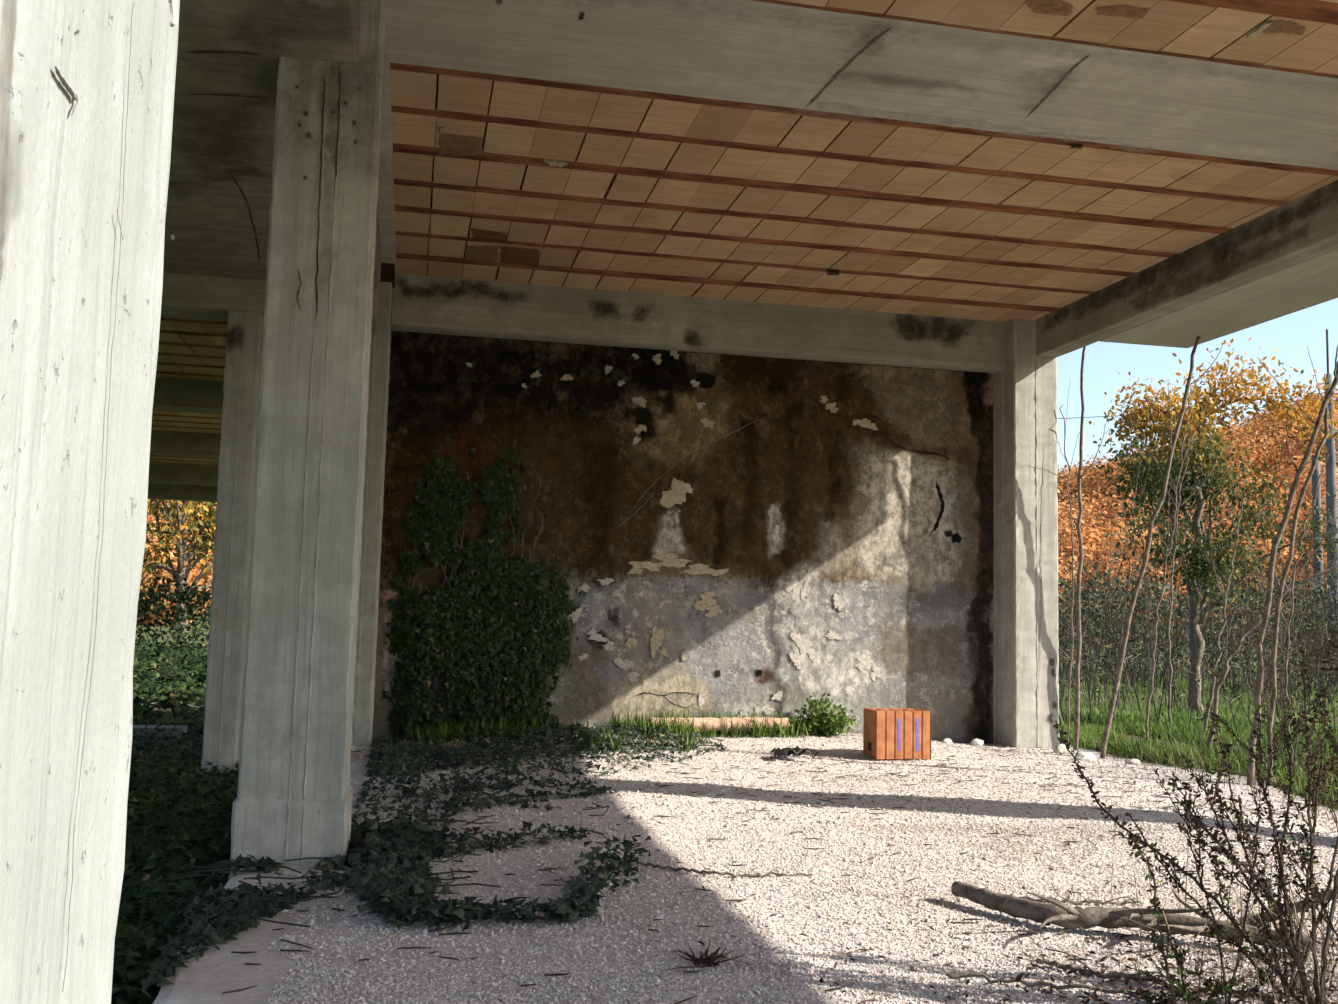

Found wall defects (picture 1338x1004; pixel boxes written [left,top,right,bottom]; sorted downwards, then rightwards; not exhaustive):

spalling [1026,0,1073,16]
spalling [1096,6,1148,18]
crack [296,65,341,324]
water stain [1045,181,1338,329]
water stain [897,314,965,342]
water stain [722,354,805,395]
water stain [380,331,715,576]
crack [928,482,945,537]
water stain [564,371,994,743]
spalling [550,552,729,682]
peeling [789,630,843,669]
peeling [737,691,783,718]